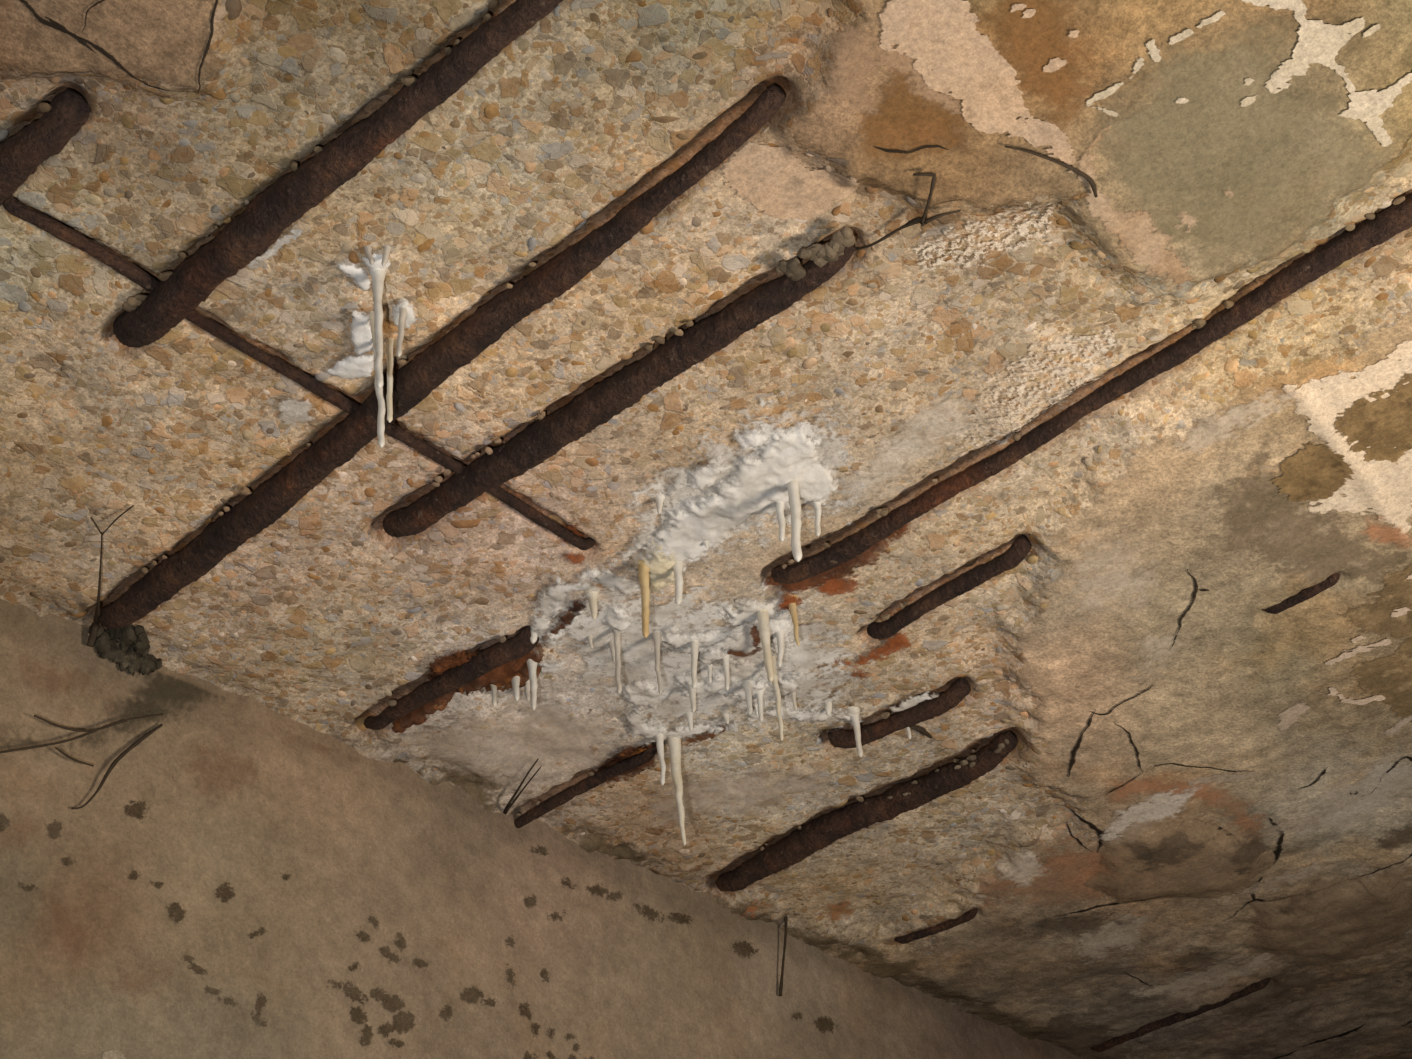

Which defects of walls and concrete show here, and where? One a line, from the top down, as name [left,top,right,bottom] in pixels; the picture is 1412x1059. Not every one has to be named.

crack [20,0,218,93]
spalling [195,0,1096,405]
corrosion [861,76,964,156]
spalling [0,205,350,630]
efflorescence [327,245,417,448]
corrosion [392,600,586,733]
spalling [125,137,1412,958]
efflorescence [421,325,1121,846]
corrosion [764,524,910,611]
crack [1169,569,1209,650]
leakage [1214,373,1412,722]
crack [1061,685,1255,853]